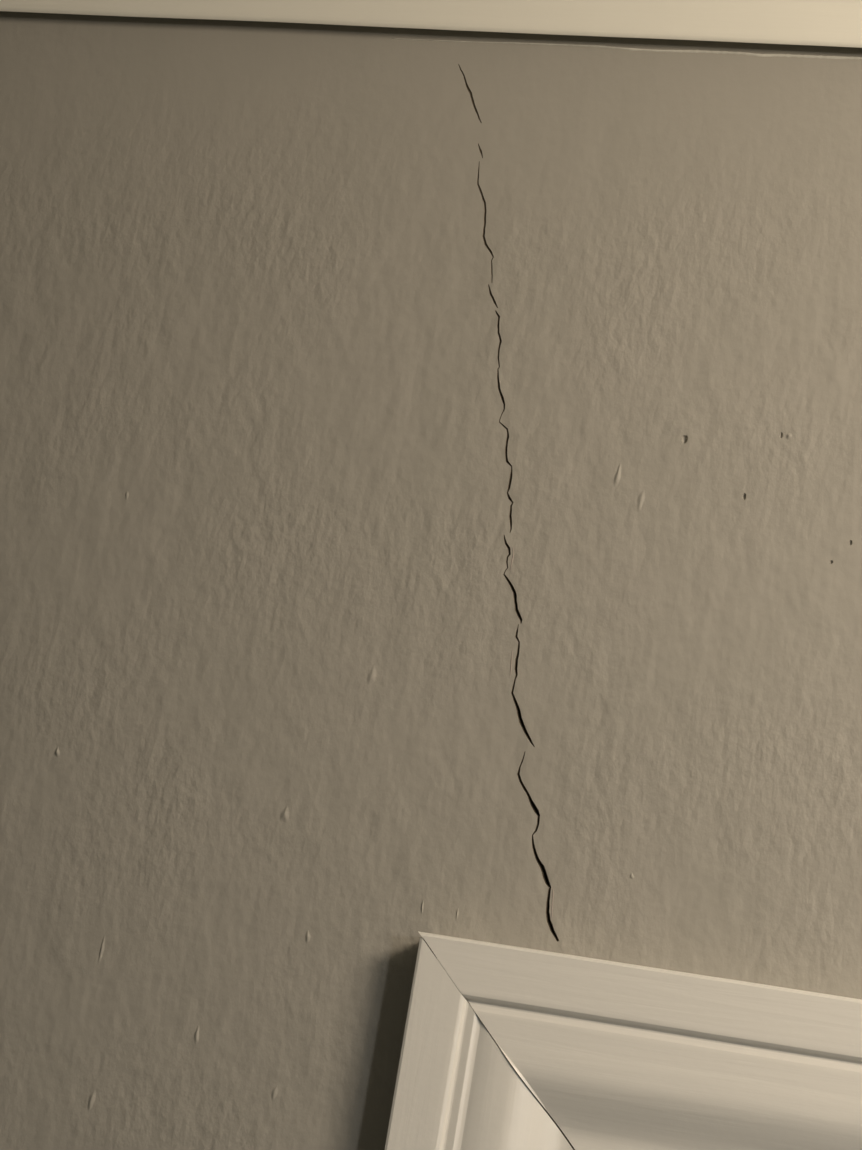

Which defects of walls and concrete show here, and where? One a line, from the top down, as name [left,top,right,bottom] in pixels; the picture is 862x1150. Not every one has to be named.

crack [458,64,559,942]